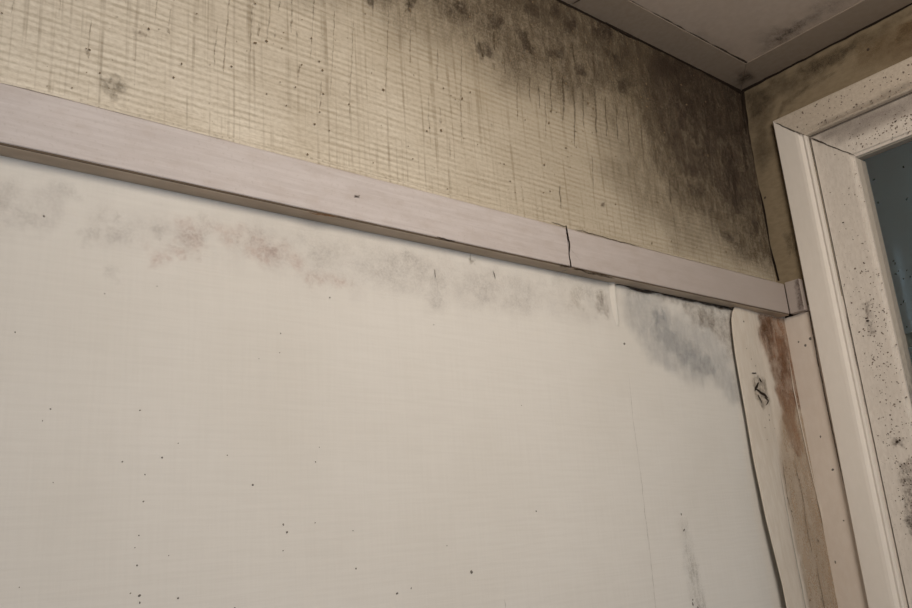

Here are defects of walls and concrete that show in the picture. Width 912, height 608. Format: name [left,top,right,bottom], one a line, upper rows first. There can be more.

water stain [437,0,772,259]
water stain [610,284,733,310]
water stain [783,410,838,608]
water stain [844,262,912,535]